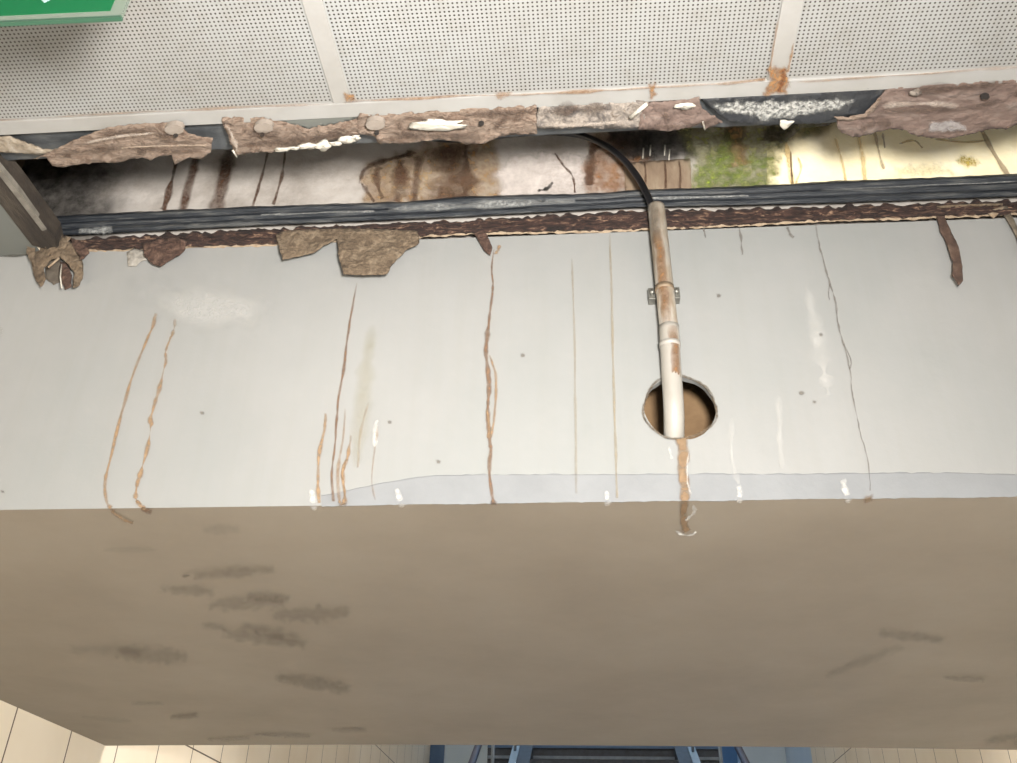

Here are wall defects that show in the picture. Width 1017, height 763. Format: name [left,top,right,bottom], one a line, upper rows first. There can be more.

corrosion [161,159,199,210]
corrosion [211,151,233,208]
water stain [321,142,532,213]
corrosion [585,136,649,192]
water stain [609,128,694,160]
flaking render [715,99,1017,185]
corrosion [69,199,1017,536]
crack [819,242,872,502]